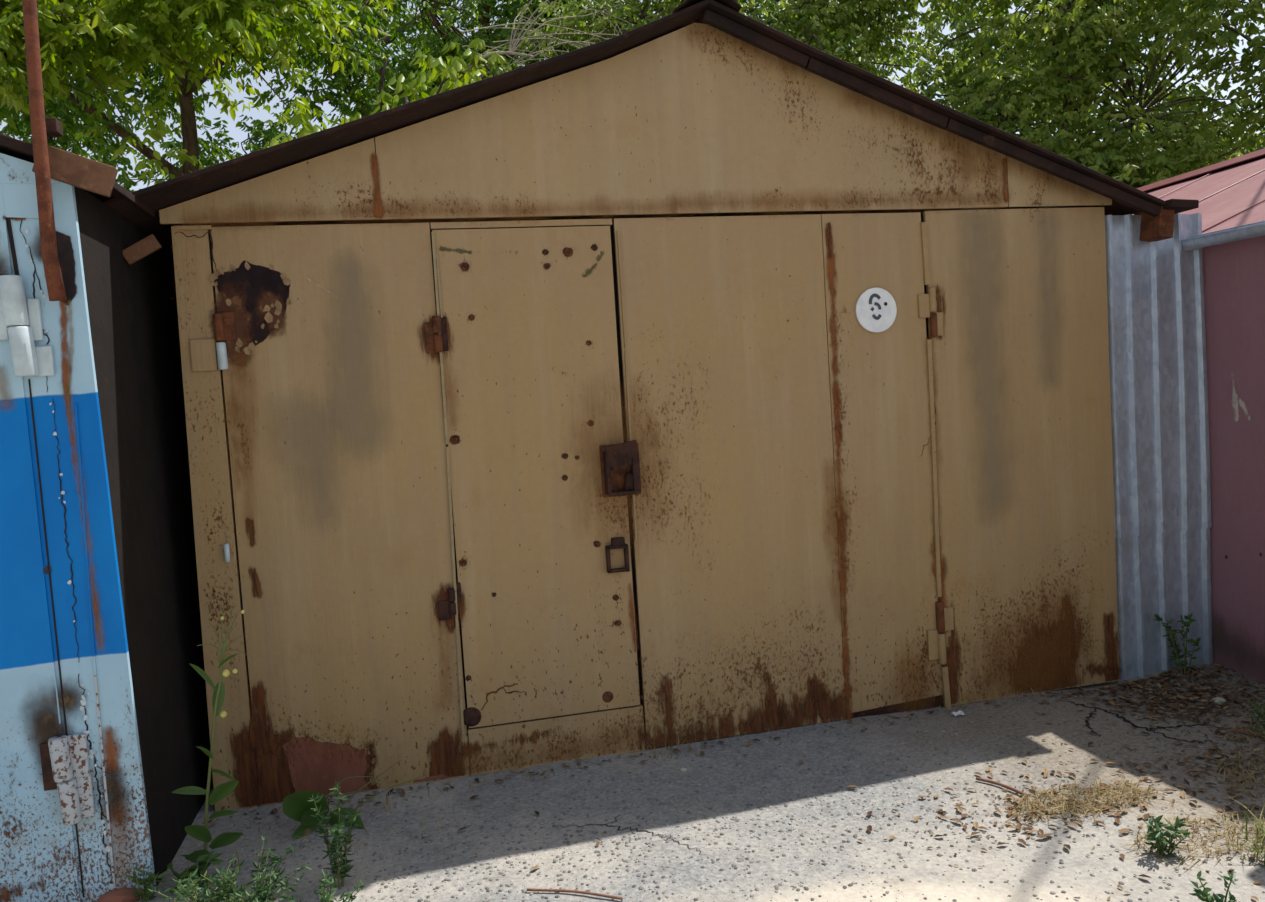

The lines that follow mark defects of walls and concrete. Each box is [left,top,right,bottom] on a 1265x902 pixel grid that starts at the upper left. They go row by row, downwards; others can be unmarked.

corrosion [337,154,406,218]
corrosion [60,301,75,464]
corrosion [427,202,1120,779]
corrosion [104,728,127,822]
corrosion [230,681,295,807]
corrosion [0,839,85,902]